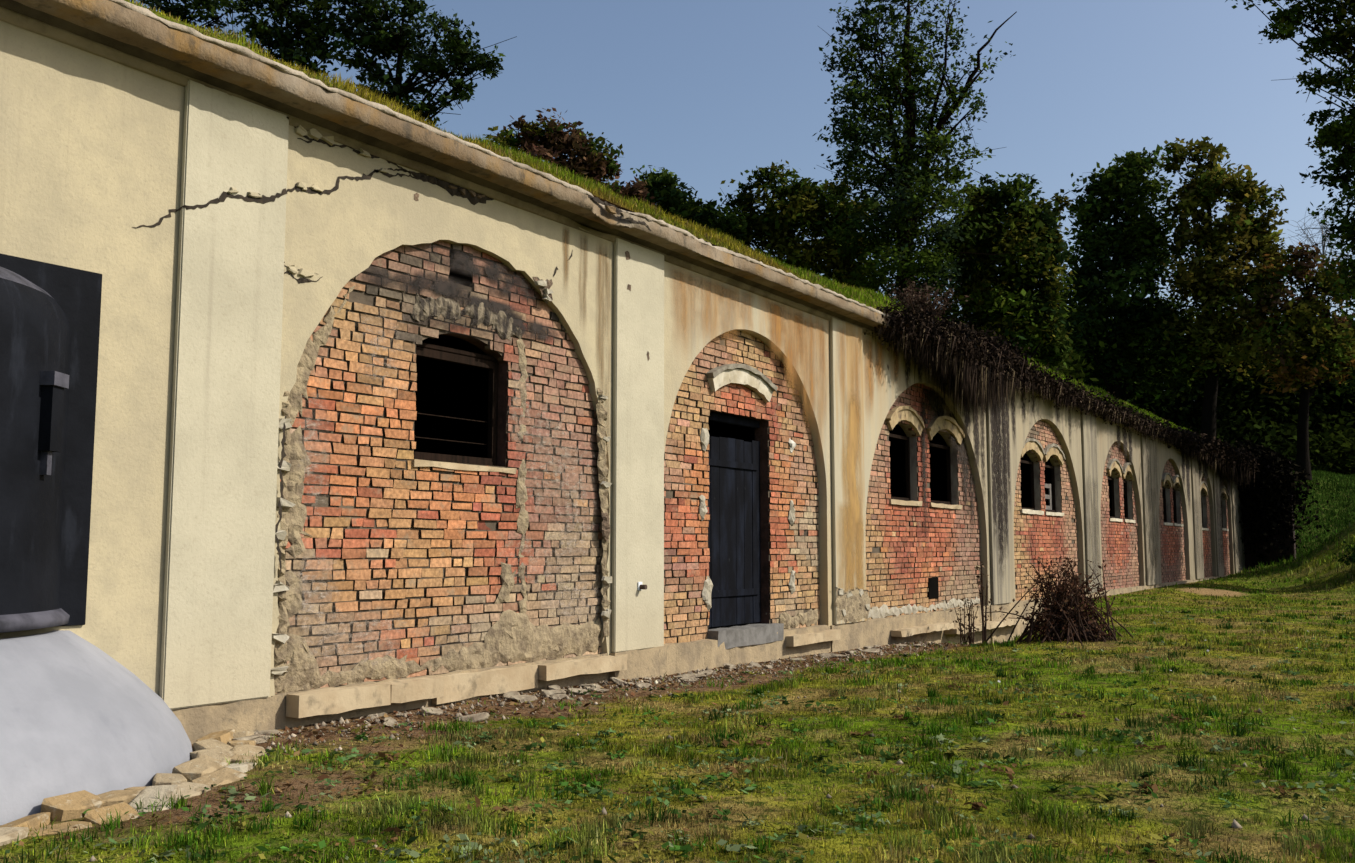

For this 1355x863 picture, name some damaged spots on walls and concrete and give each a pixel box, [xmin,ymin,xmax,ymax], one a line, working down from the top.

crack [133,116,423,228]
spalling [284,262,323,284]
spalling [533,250,573,303]
peeling [700,428,709,452]
leakage [894,347,1035,553]
peeling [270,286,613,693]
peeling [699,495,708,521]
peeling [702,575,713,611]